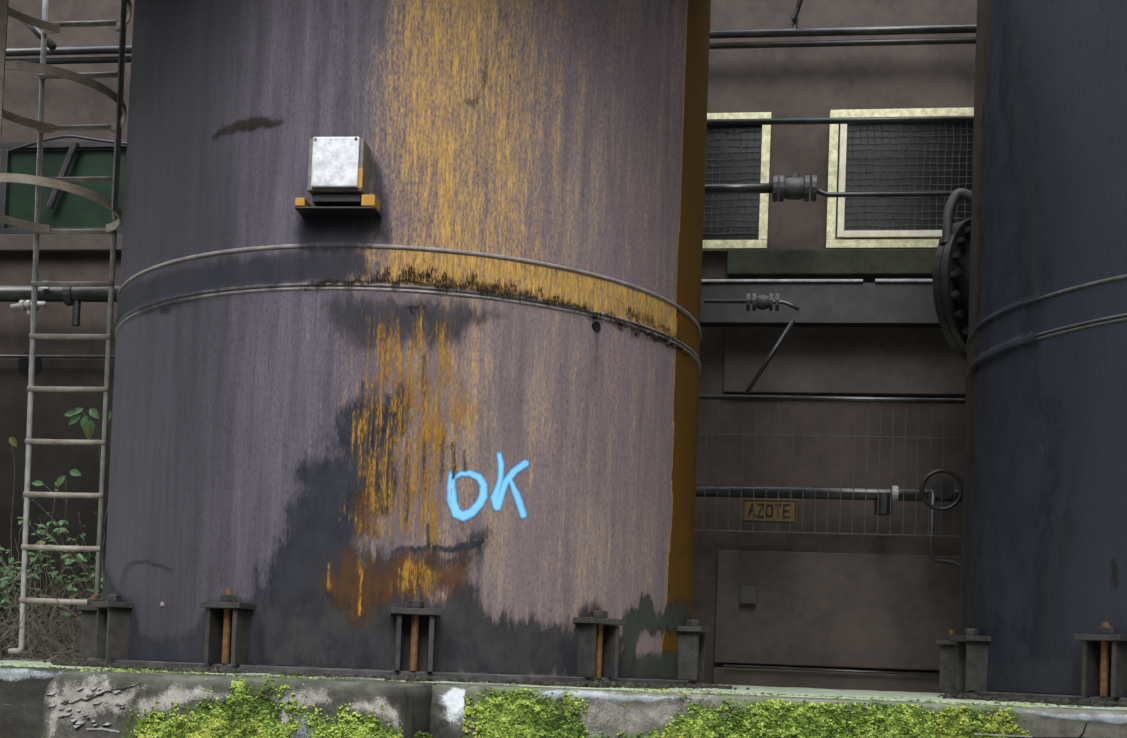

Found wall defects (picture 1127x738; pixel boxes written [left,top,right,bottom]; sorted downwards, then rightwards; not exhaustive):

rust [322,307,480,624]
spalling [47,676,137,735]